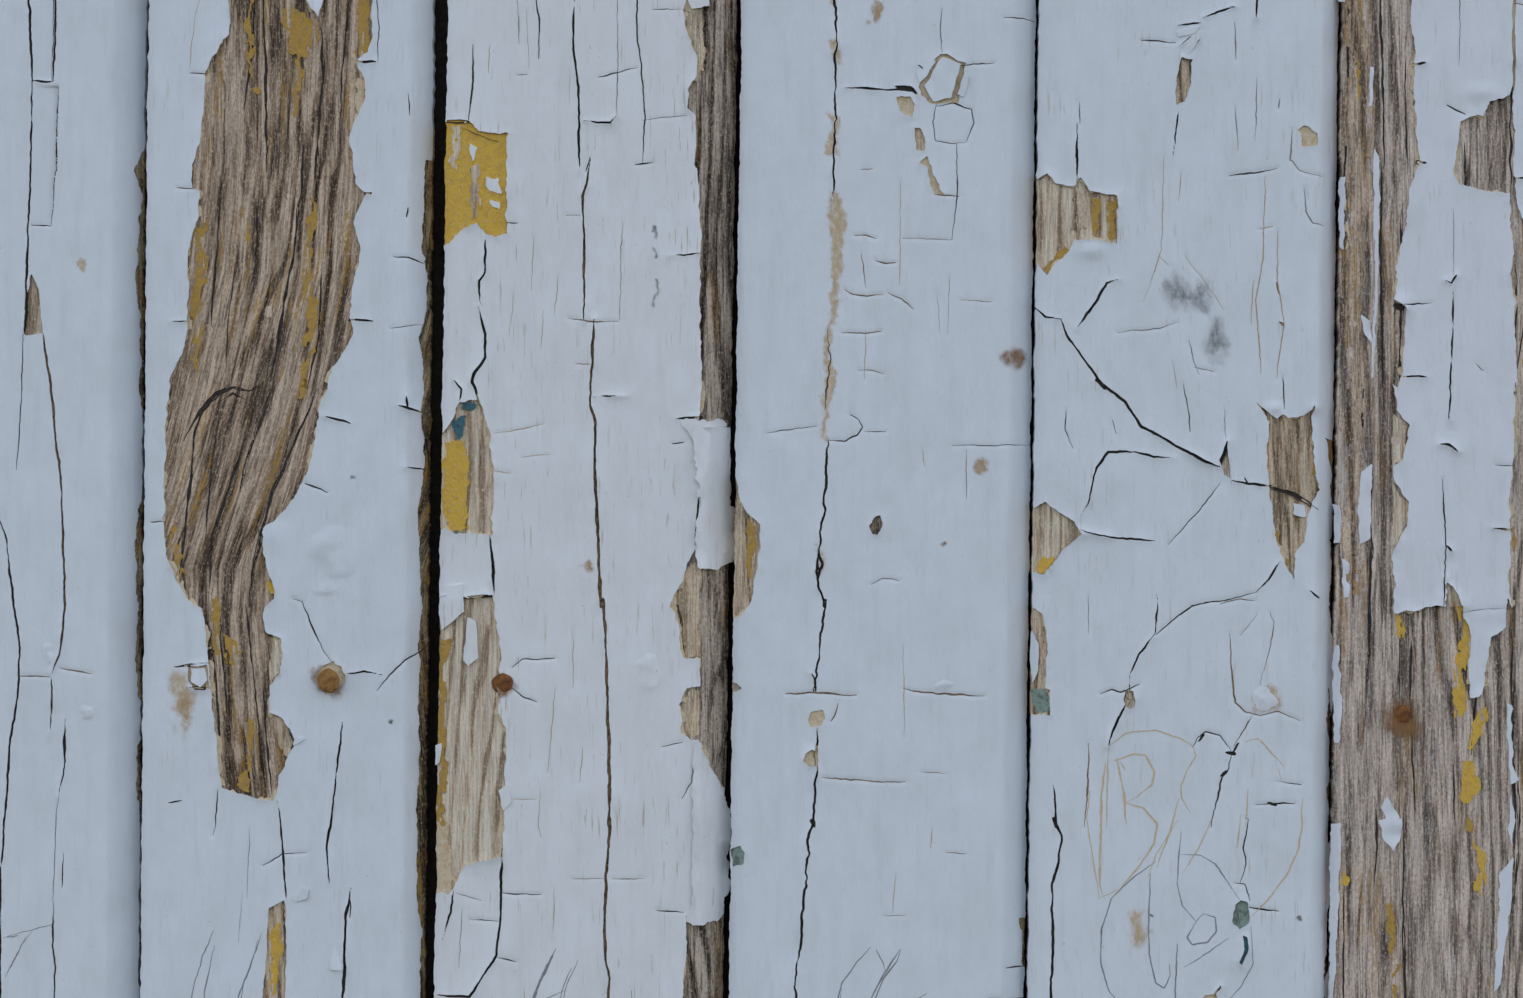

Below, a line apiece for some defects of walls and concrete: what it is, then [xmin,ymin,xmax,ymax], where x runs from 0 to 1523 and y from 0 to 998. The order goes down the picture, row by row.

crack [0,0,91,998]
peeling [134,150,146,987]
peeling [163,0,373,803]
peeling [416,120,512,998]
crack [399,0,686,998]
peeling [670,0,761,998]
crack [769,0,992,998]
peeling [1035,174,1118,275]
crack [1007,563,1302,998]
crack [1034,86,1323,545]
crack [1141,0,1258,57]
peeling [1257,0,1523,998]